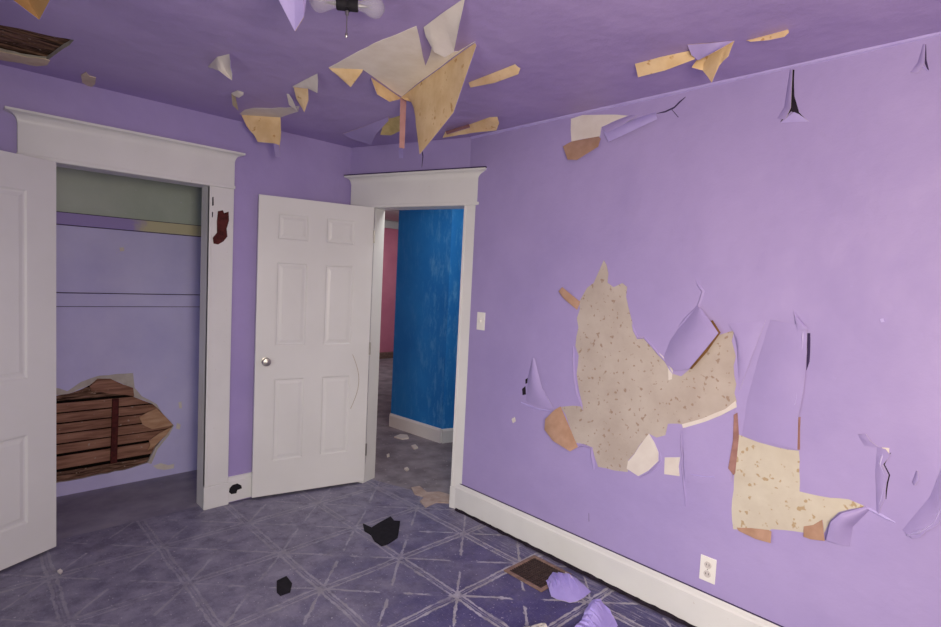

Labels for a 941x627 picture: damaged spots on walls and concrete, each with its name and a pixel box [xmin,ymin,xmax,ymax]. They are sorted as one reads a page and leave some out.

spalling [0,42,50,66]
peeling [293,73,318,93]
flaking render [329,26,474,97]
flaking render [571,115,626,141]
crack [777,70,808,123]
flaking render [561,261,737,472]
spalling [56,373,181,483]
flaking render [732,435,864,533]